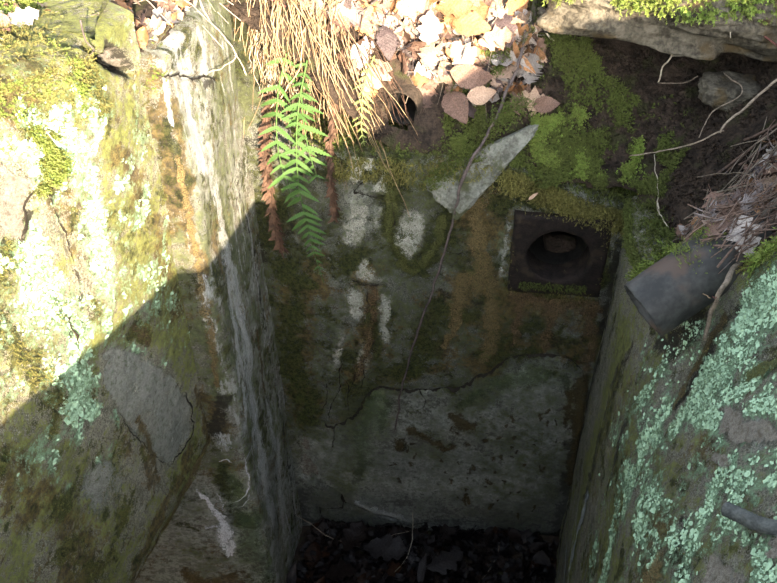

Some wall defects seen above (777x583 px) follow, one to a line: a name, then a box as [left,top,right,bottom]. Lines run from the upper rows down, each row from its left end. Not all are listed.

damp [194,26,208,75]
damp [162,84,174,127]
damp [384,215,448,276]
damp [172,52,286,530]
crack [308,280,589,447]
damp [196,489,237,558]